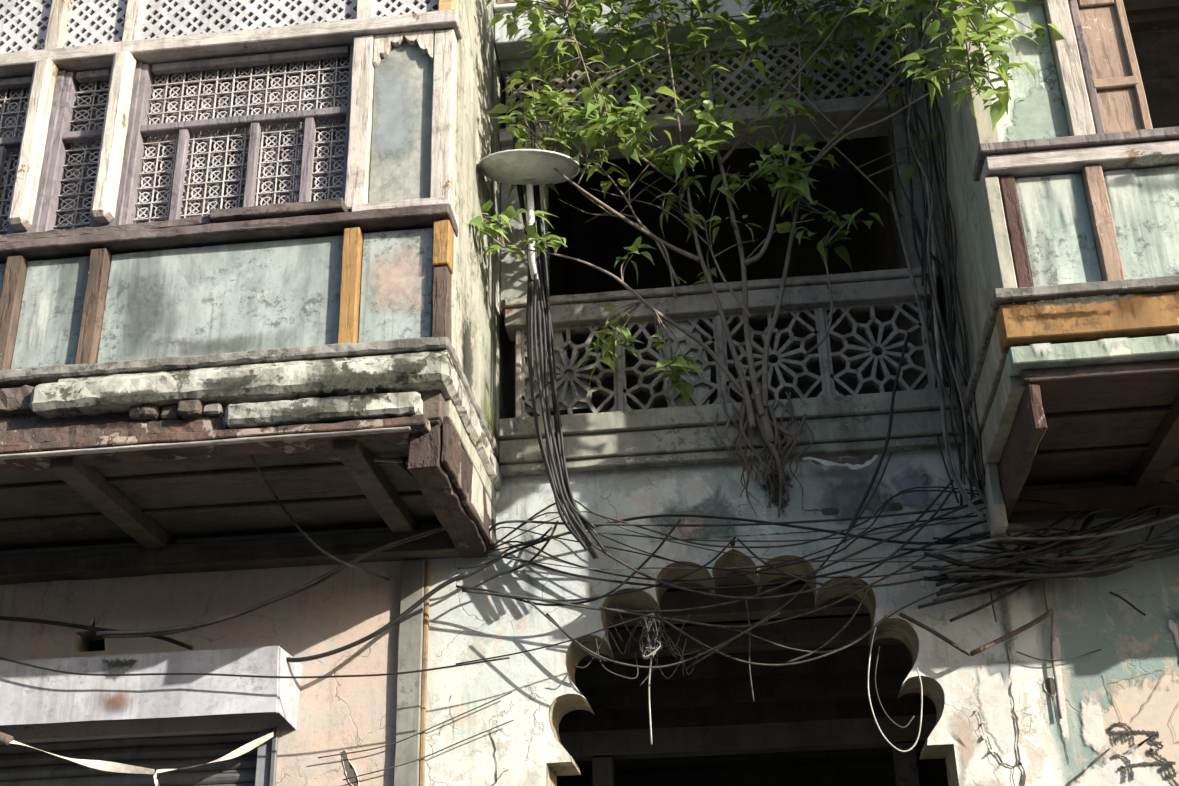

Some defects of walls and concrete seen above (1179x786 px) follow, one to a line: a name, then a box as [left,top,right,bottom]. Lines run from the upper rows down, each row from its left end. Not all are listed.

crack [490,733,510,786]
crack [978,642,1026,786]
crack [1052,696,1110,786]
peeling [1042,629,1179,786]
crack [1105,620,1179,742]